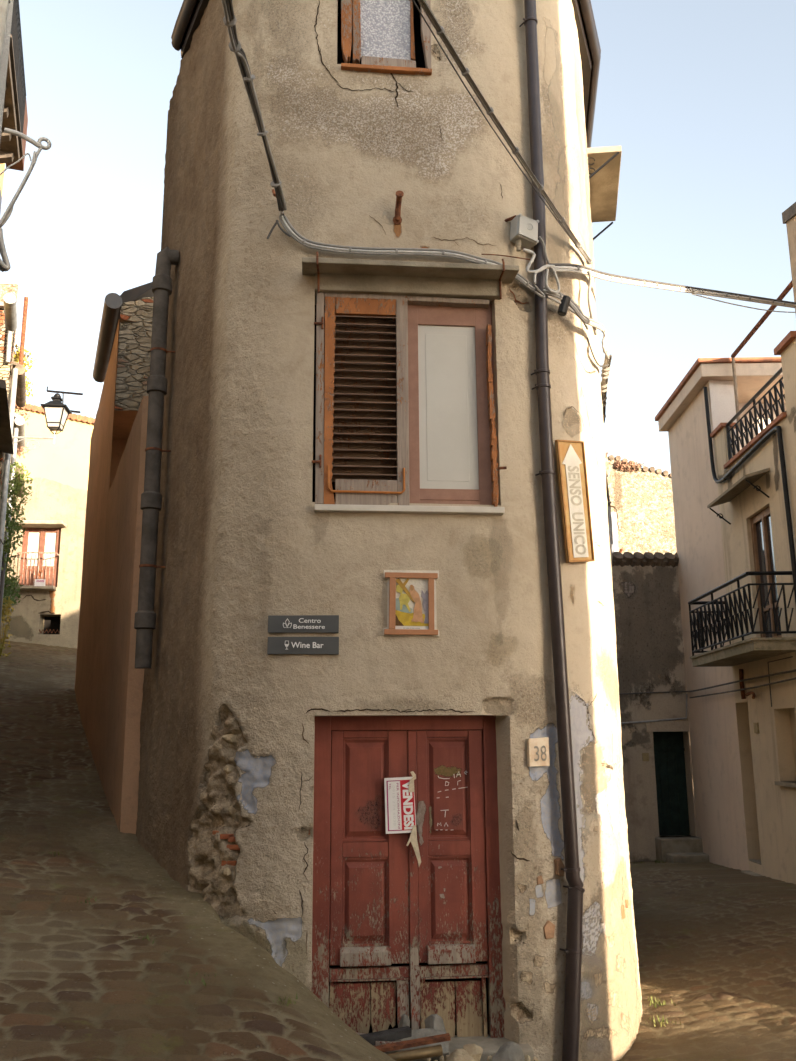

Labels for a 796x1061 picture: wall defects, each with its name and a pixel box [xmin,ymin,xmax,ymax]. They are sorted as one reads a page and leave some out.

crack [314,1,409,107]
spalling [187,704,302,967]
peeling [528,723,565,916]
peeling [569,694,620,882]